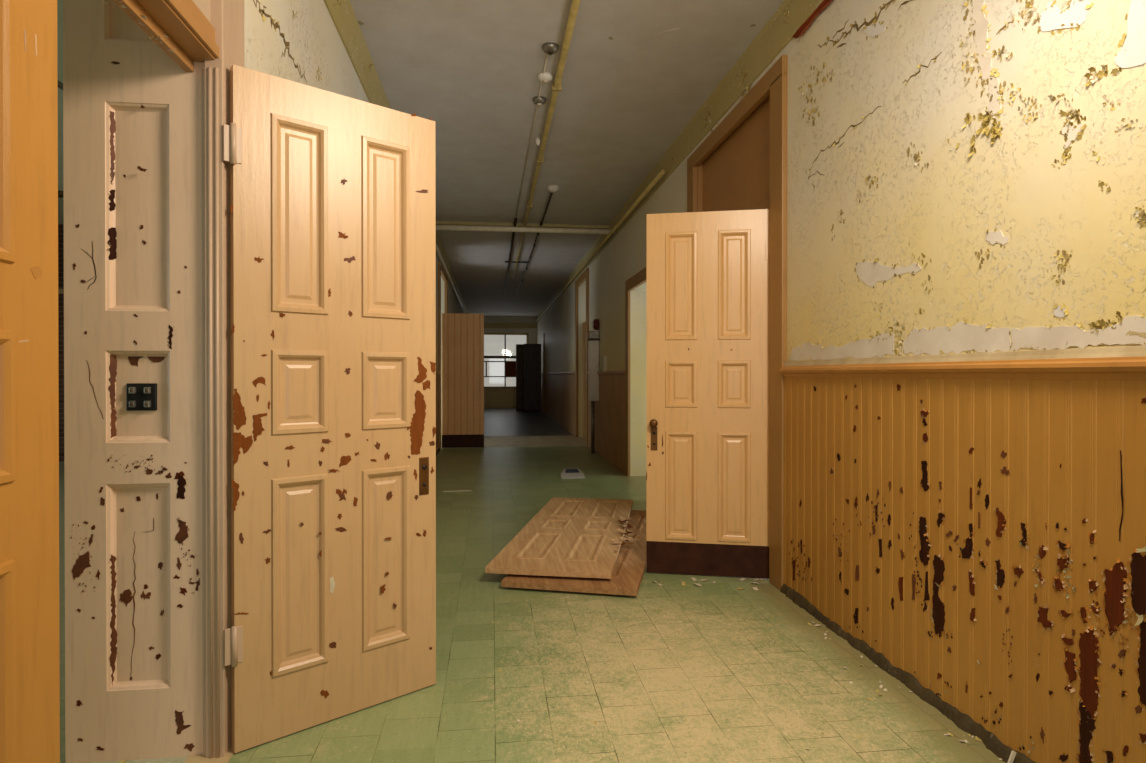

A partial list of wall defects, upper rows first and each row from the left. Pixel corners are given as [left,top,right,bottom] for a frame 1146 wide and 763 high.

crack [253,0,307,83]
peeling [783,0,830,38]
crack [819,0,913,48]
peeling [1084,0,1146,87]
peeling [798,63,835,126]
crack [808,106,881,180]
peeling [902,142,929,170]
peeling [947,0,1094,169]
peeling [1102,95,1146,136]
peeling [975,228,1009,269]
peeling [789,250,1146,361]
peeling [920,399,930,444]